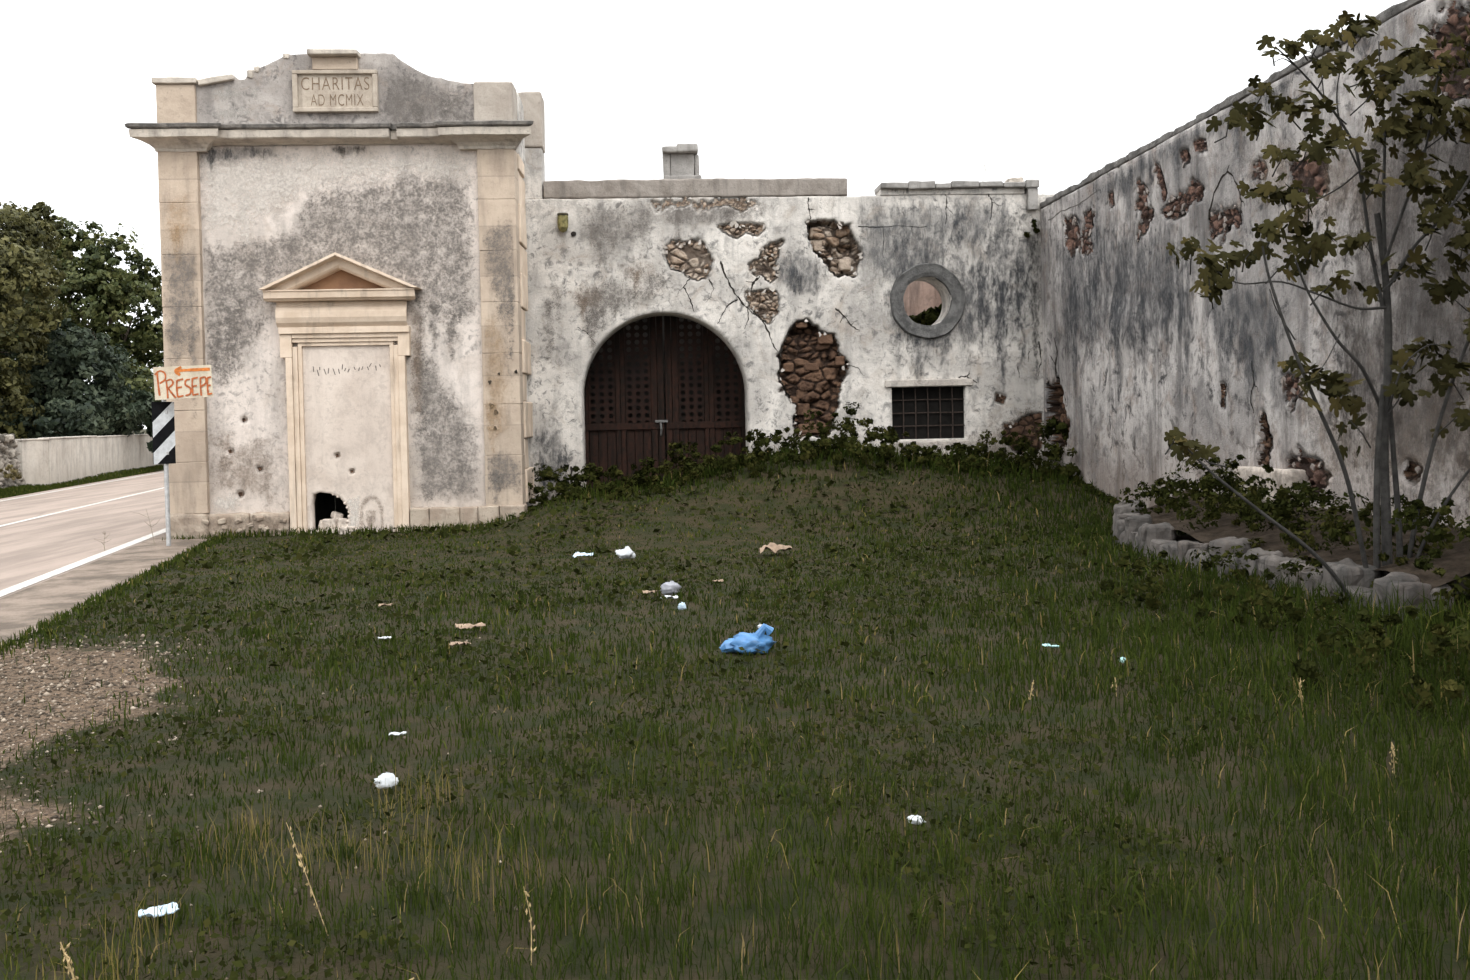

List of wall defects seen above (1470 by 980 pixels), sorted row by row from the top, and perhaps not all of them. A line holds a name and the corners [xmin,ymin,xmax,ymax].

water stain [207,147,269,164]
water stain [164,180,521,502]
spalling [651,197,784,323]
spalling [778,319,849,437]
spalling [806,199,1010,276]
water stain [886,115,1278,400]
water stain [1321,82,1470,482]